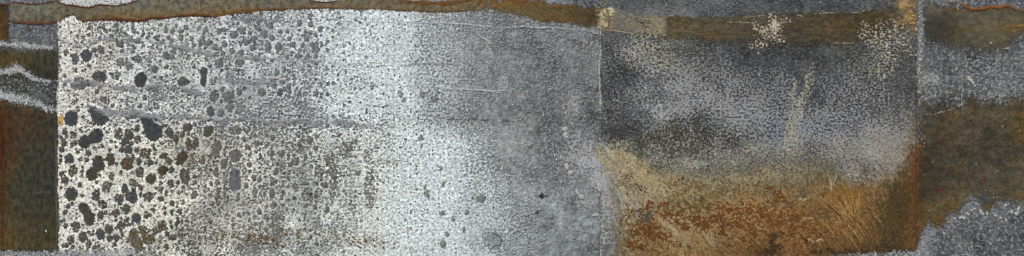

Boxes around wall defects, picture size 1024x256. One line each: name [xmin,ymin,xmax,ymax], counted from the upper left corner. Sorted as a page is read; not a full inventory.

damp [0,8,594,256]
rust [0,0,599,42]
damp [522,0,1024,256]
rust [594,117,959,256]